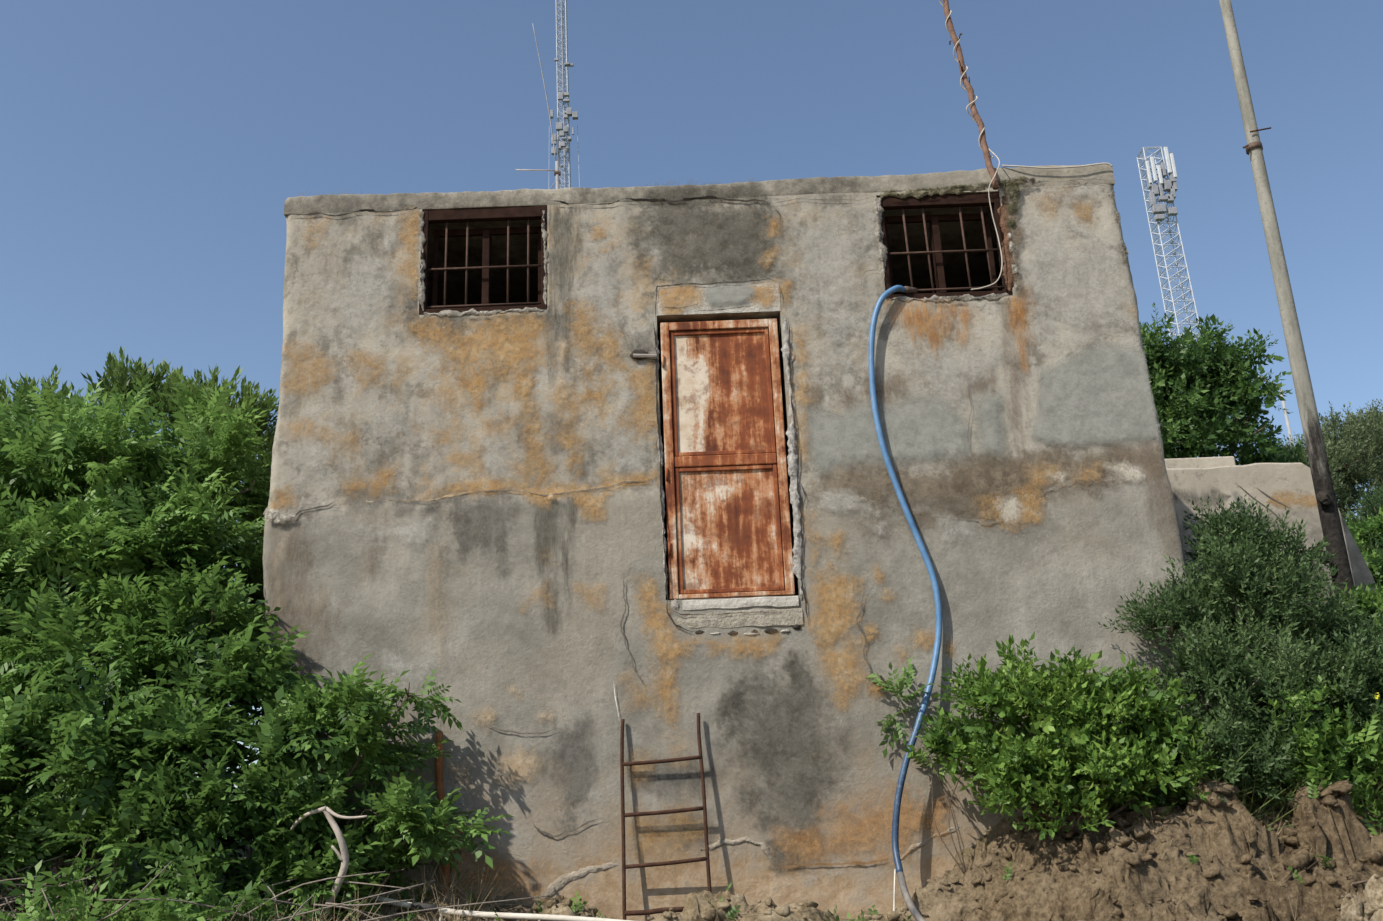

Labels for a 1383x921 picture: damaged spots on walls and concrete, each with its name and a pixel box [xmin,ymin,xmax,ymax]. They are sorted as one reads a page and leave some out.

water stain [630,185,786,287]
crack [264,502,340,527]
crack [396,278,843,633]
peeling [1003,498,1019,521]
peeling [1108,464,1142,481]
crack [615,578,644,687]
water stain [723,654,845,872]